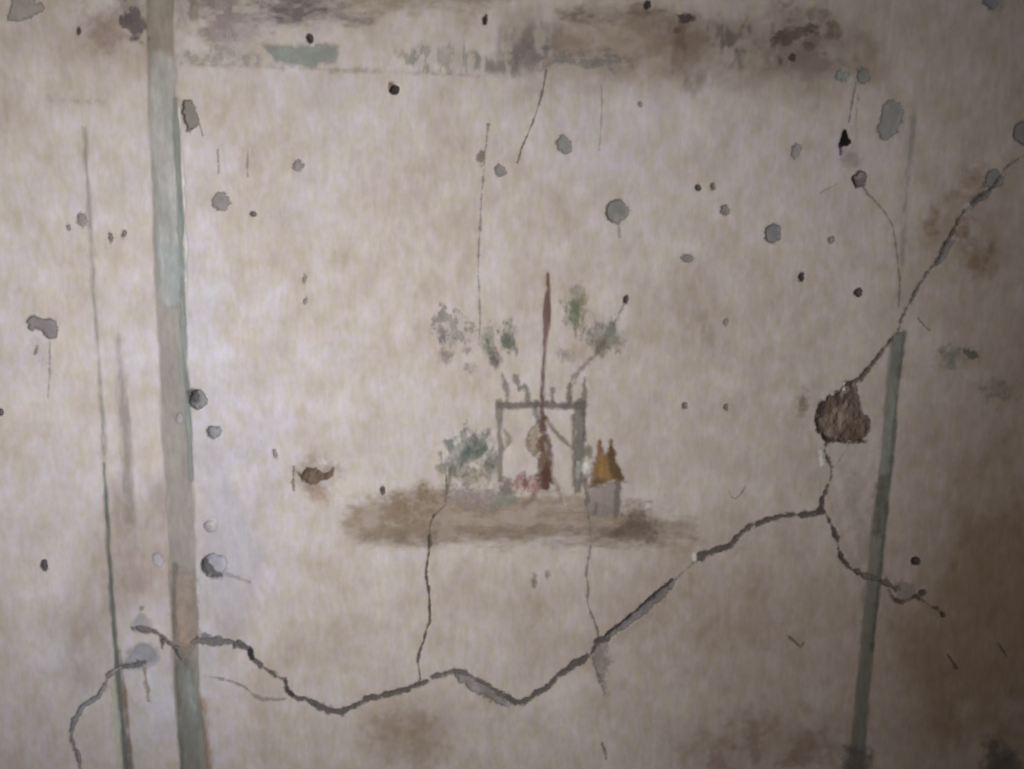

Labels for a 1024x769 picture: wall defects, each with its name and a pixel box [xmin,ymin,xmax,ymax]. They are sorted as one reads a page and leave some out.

damp [189,0,372,41]
damp [674,14,695,48]
damp [771,16,830,67]
spalling [181,100,203,135]
spalling [877,100,904,140]
crack [477,124,490,162]
crack [845,162,1023,389]
spalling [26,315,58,354]
spalling [815,380,871,443]
spalling [291,459,334,491]
crack [692,442,945,617]
crack [70,478,676,769]